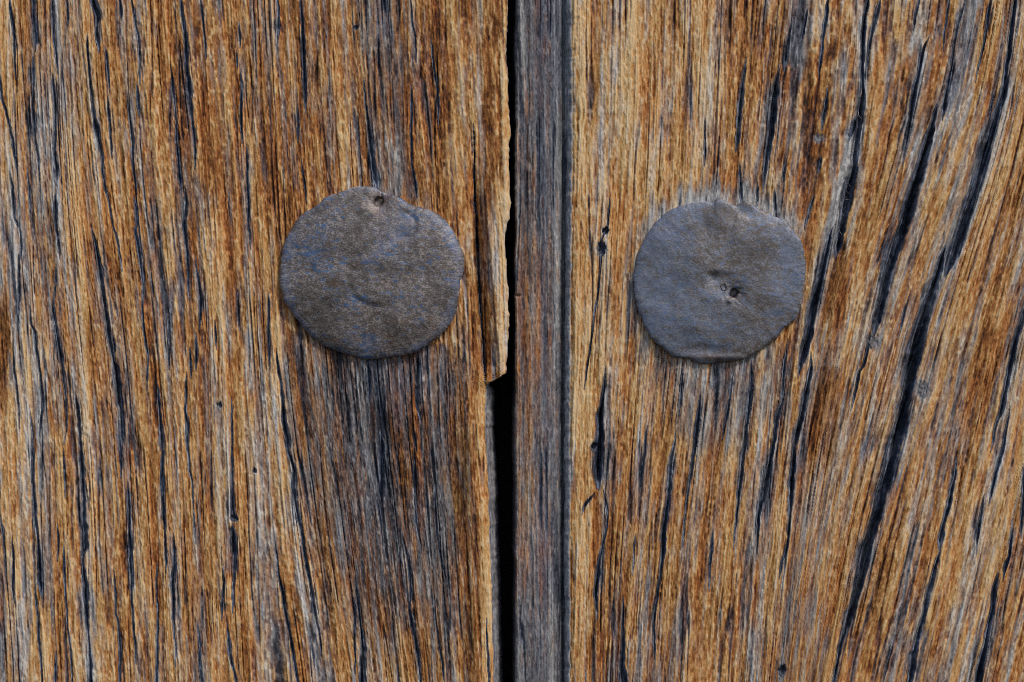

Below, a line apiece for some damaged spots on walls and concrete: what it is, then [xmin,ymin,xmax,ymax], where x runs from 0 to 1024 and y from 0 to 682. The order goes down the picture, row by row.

crack [473,123,486,384]
crack [582,0,881,682]